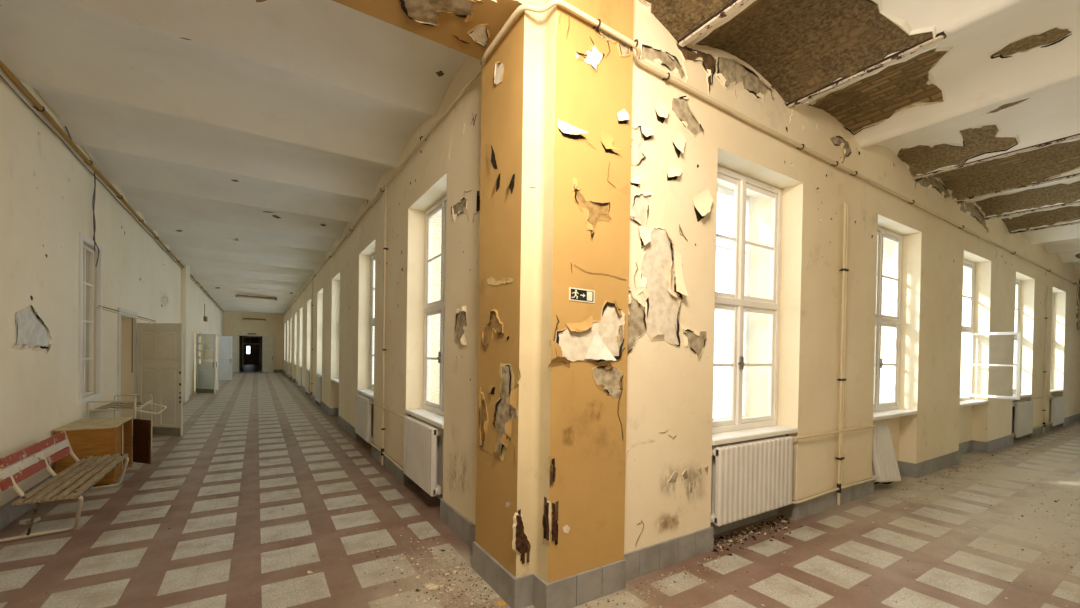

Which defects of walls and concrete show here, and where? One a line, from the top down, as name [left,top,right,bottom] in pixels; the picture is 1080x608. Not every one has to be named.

peeling [399,0,490,48]
peeling [575,22,772,104]
peeling [486,143,515,194]
peeling [692,189,713,222]
peeling [915,176,989,232]
peeling [548,93,707,399]
peeling [12,296,51,353]
peeling [455,306,468,359]
peeling [482,309,509,352]
peeling [479,363,519,461]
spalling [542,458,570,545]
spalling [506,501,531,564]